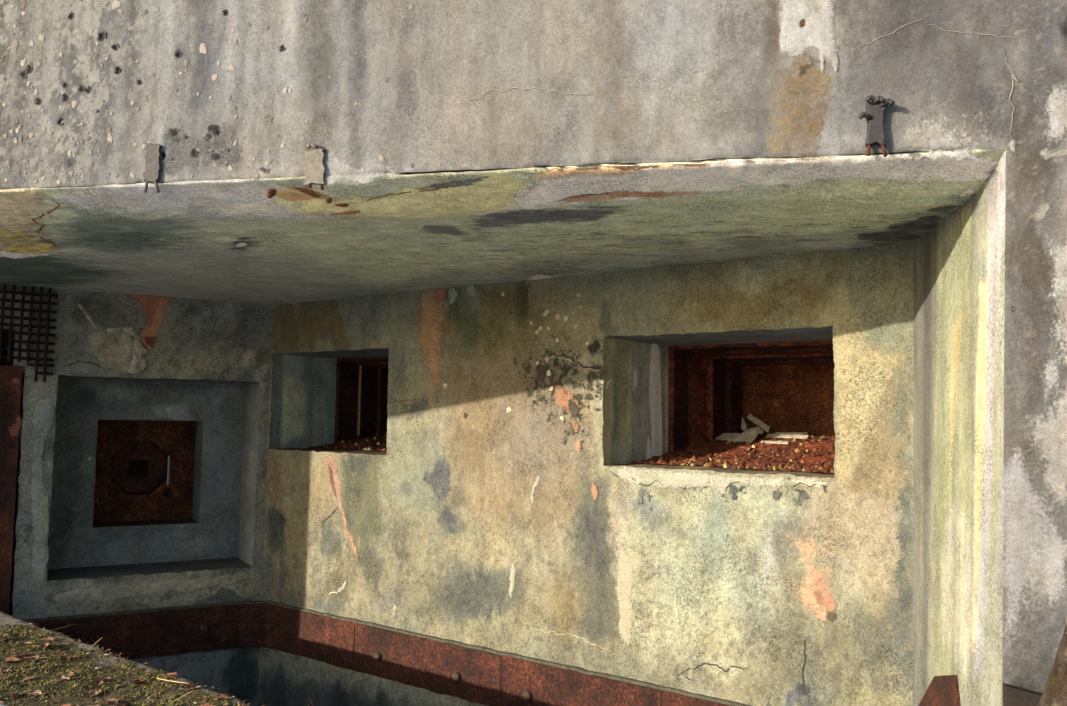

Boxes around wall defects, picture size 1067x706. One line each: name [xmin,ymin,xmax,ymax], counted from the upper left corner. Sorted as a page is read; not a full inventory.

crack [859,15,1019,138]
leakage [1037,85,1067,159]
corrosion [266,185,359,215]
leakage [1033,203,1052,222]
leakage [0,251,51,259]
spalling [87,326,148,374]
peeling [536,357,581,451]
corrosion [323,454,357,556]
corrosion [786,529,836,622]